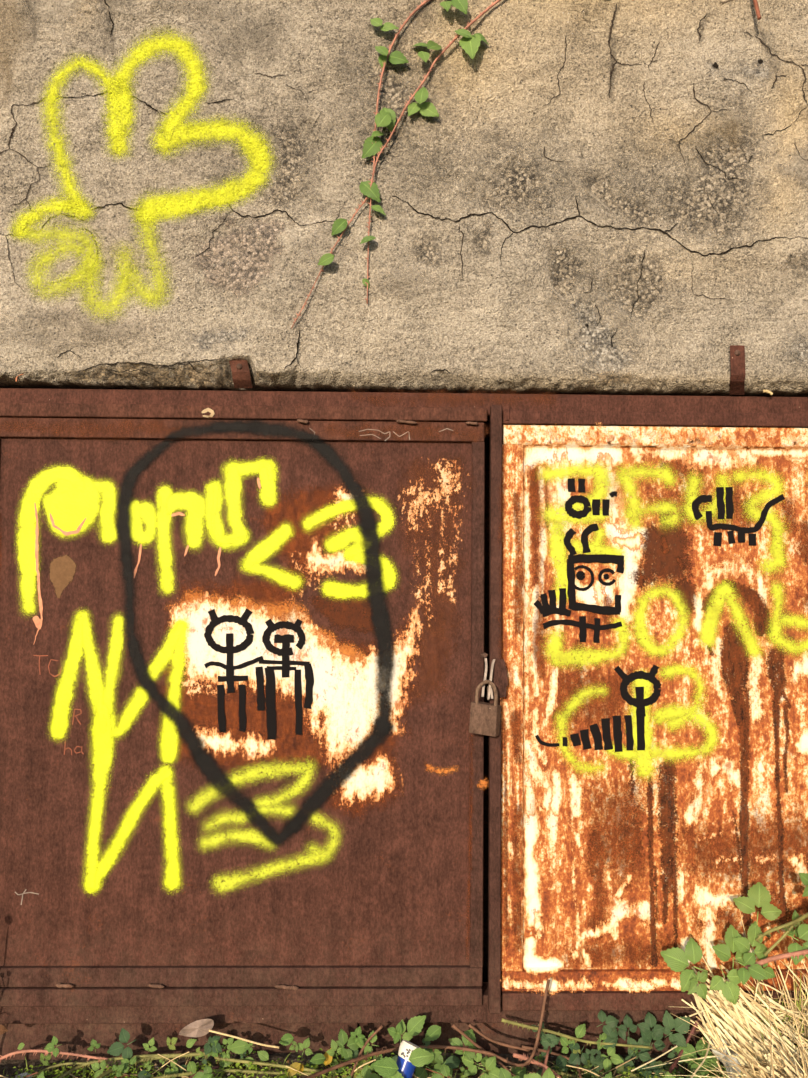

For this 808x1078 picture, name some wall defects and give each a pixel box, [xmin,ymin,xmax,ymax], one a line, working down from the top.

crack [0,91,171,290]
crack [200,202,348,254]
crack [392,196,805,351]
crack [608,4,660,120]
crack [670,32,808,215]
rust [158,659,356,772]
rust [171,485,377,666]
peeling [166,458,469,807]
rust [500,459,550,678]
peeling [500,422,808,996]
rust [629,459,759,613]
rust [681,808,808,931]